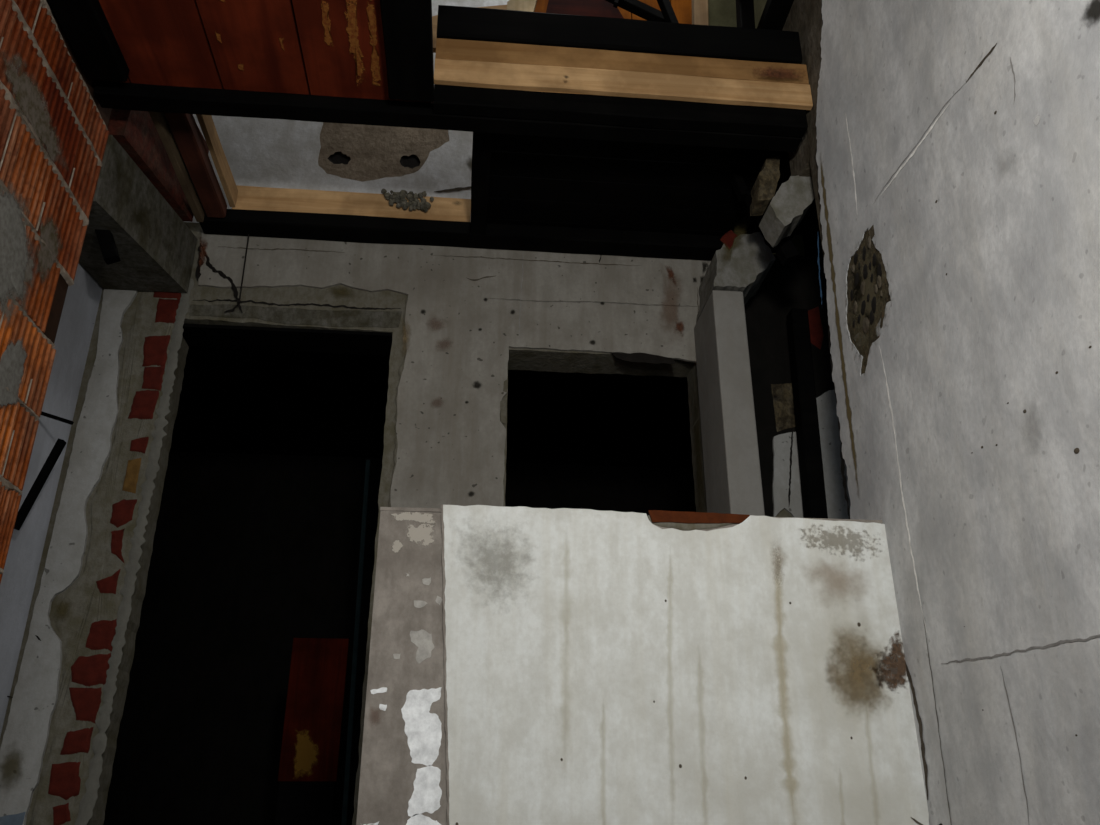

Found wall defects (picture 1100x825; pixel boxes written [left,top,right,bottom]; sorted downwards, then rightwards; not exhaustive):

crack [195,243,401,313]
spalling [847,225,891,375]
peeling [388,295,435,553]
peeling [370,687,387,711]
peeling [401,687,442,825]
peeling [410,629,434,663]
corrosion [873,633,907,689]
crack [921,606,1100,825]